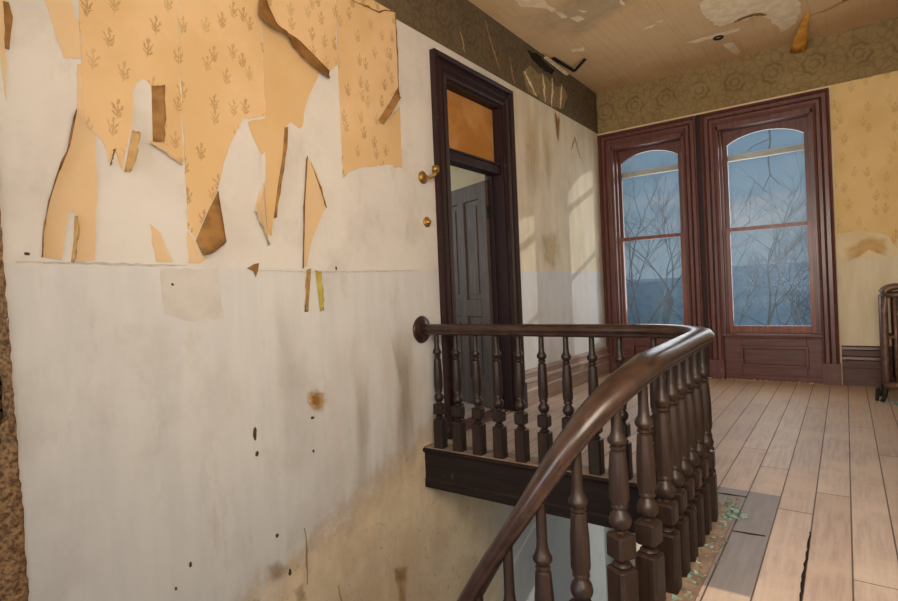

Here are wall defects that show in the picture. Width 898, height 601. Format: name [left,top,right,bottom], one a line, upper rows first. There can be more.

peeling [45,0,81,58]
flaking render [515,0,587,22]
flaking render [686,0,801,55]